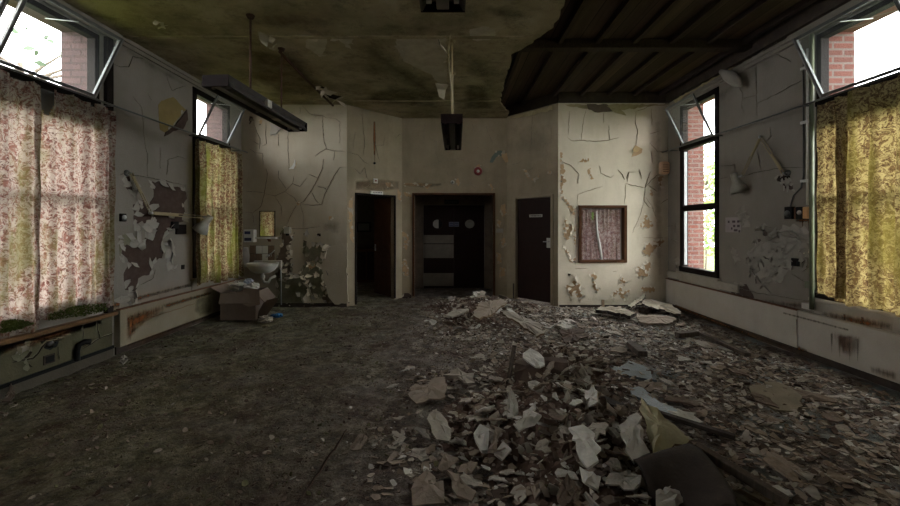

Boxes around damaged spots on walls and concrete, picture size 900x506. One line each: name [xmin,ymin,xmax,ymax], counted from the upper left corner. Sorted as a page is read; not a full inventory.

peeling [114,175,189,308]
crack [245,109,385,233]
peeling [275,197,355,307]
peeling [559,151,666,304]
crack [565,107,668,233]
rust [128,292,212,346]